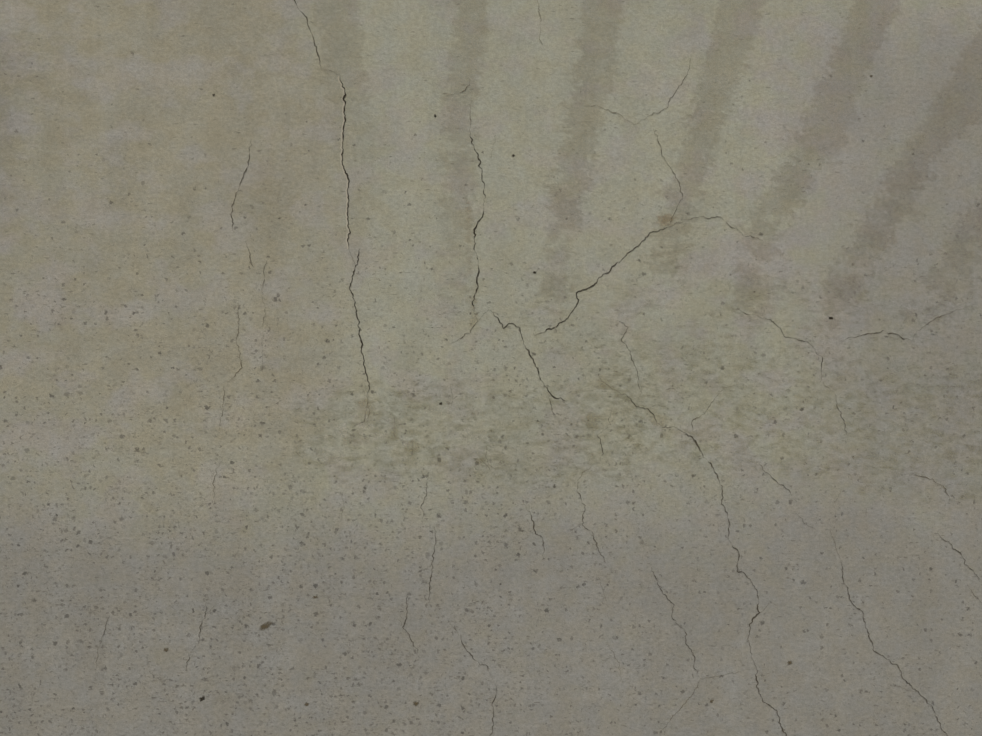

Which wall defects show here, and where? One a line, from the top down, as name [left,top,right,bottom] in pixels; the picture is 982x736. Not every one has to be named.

crack [294,0,370,425]
crack [451,72,763,408]
crack [571,321,787,736]
crack [758,463,948,736]